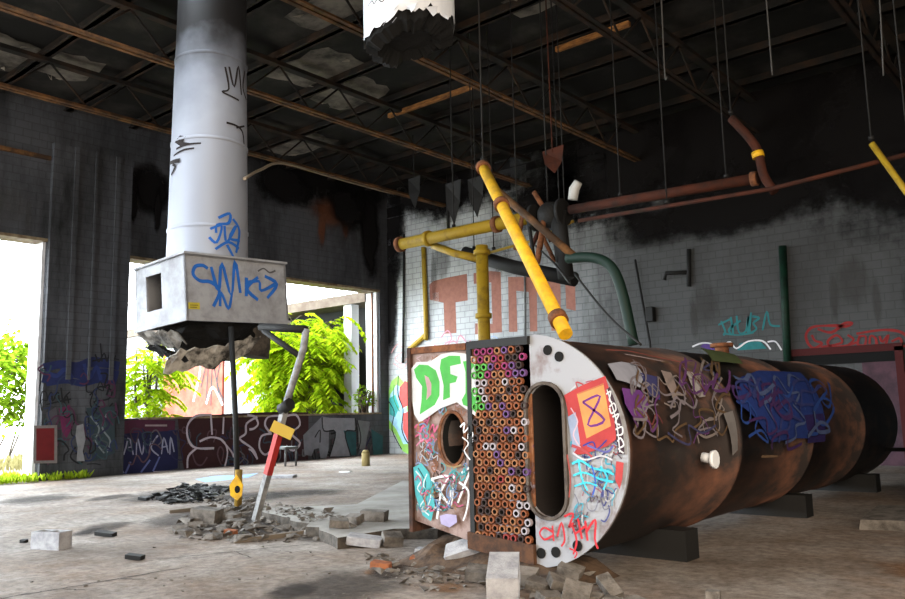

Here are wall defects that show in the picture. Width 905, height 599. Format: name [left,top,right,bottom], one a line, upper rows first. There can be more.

damp [511,54,905,245]